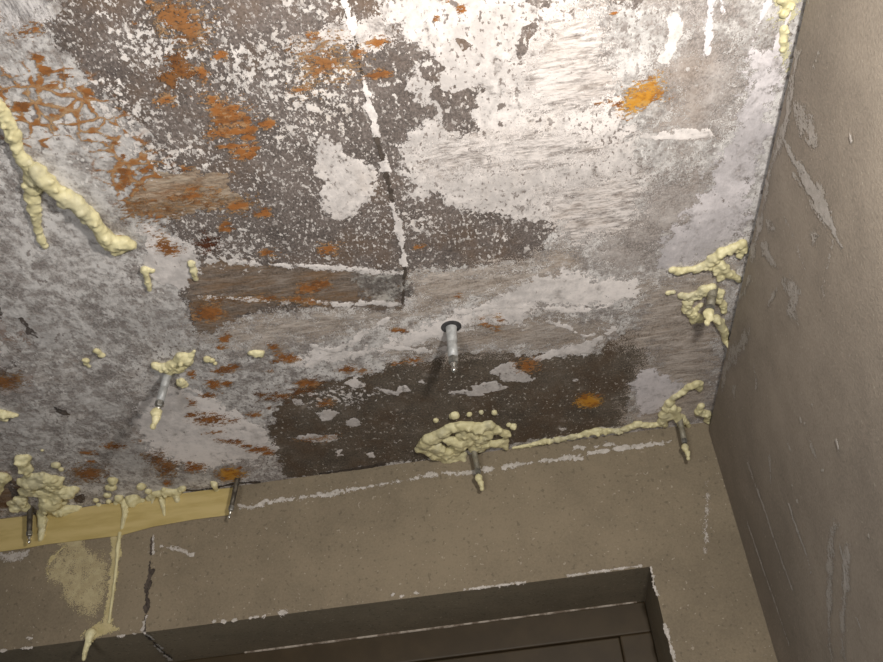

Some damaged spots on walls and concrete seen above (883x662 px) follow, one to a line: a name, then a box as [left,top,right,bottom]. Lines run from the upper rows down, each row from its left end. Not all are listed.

rust [0,17,45,52]
rust [0,54,274,257]
rust [145,0,279,162]
crack [340,0,408,304]
rust [594,69,674,121]
rust [316,241,347,260]
spalling [0,0,792,479]
rust [572,391,604,410]
water stain [538,440,672,463]
crack [140,535,172,661]